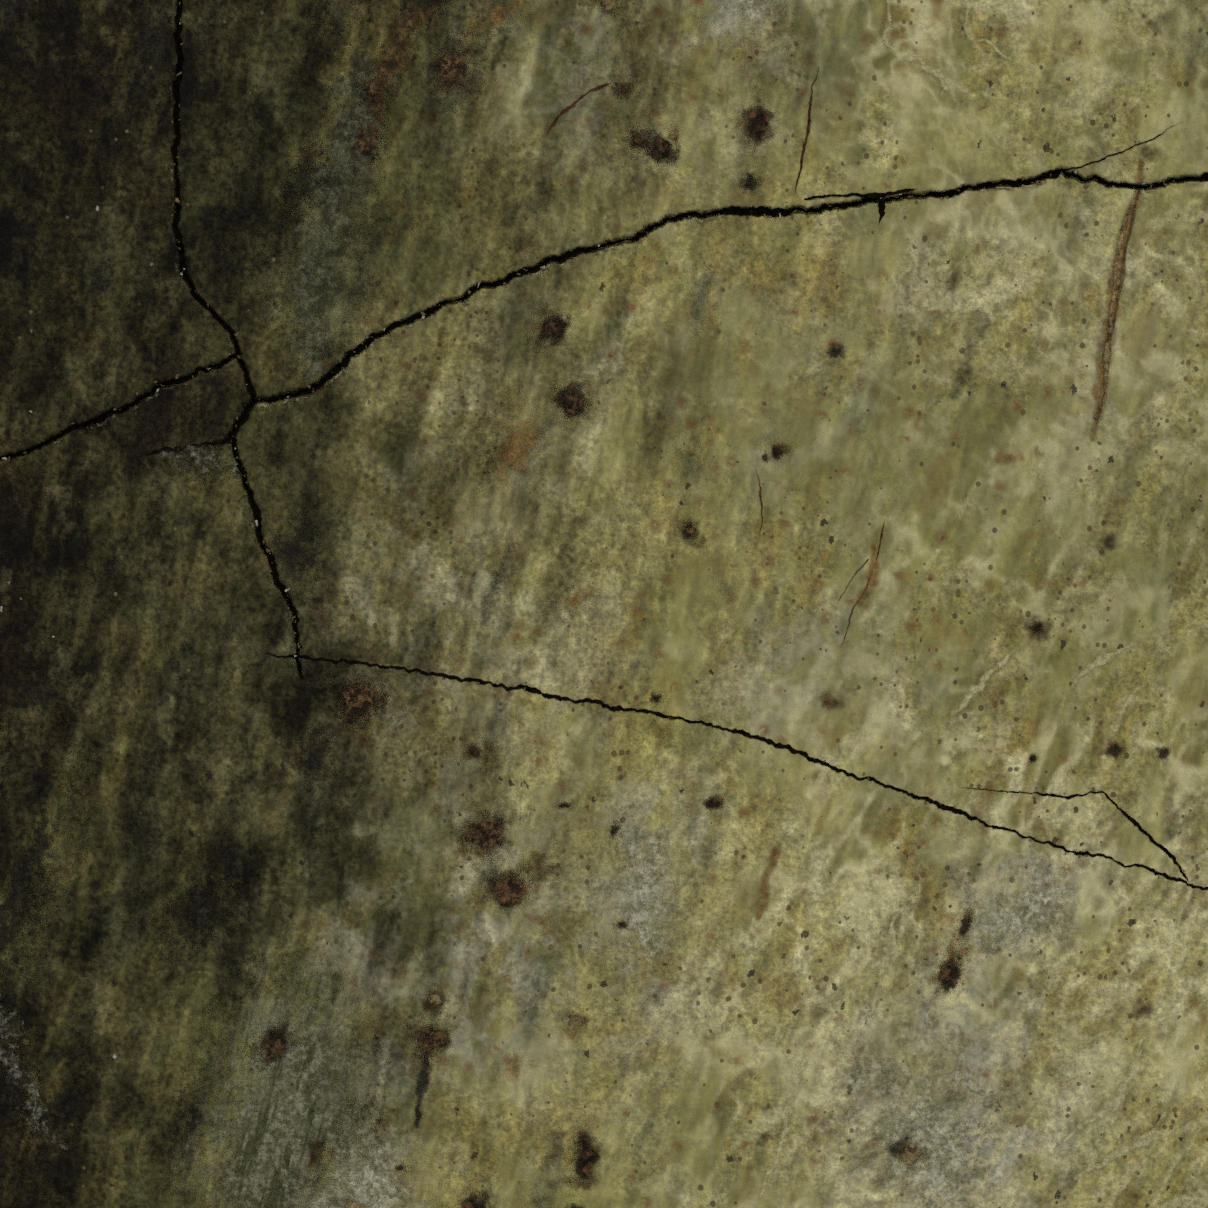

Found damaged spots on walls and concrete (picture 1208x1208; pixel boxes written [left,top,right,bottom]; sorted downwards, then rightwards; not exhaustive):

water stain [483,165,551,263]
corrosion [1091,147,1154,440]
corrosion [554,385,585,415]
crack [0,0,1208,890]
water stain [0,0,511,1208]
corrosion [466,818,504,856]
corrosion [487,858,555,908]
corrosion [423,992,445,1014]
corrosion [414,1028,450,1128]